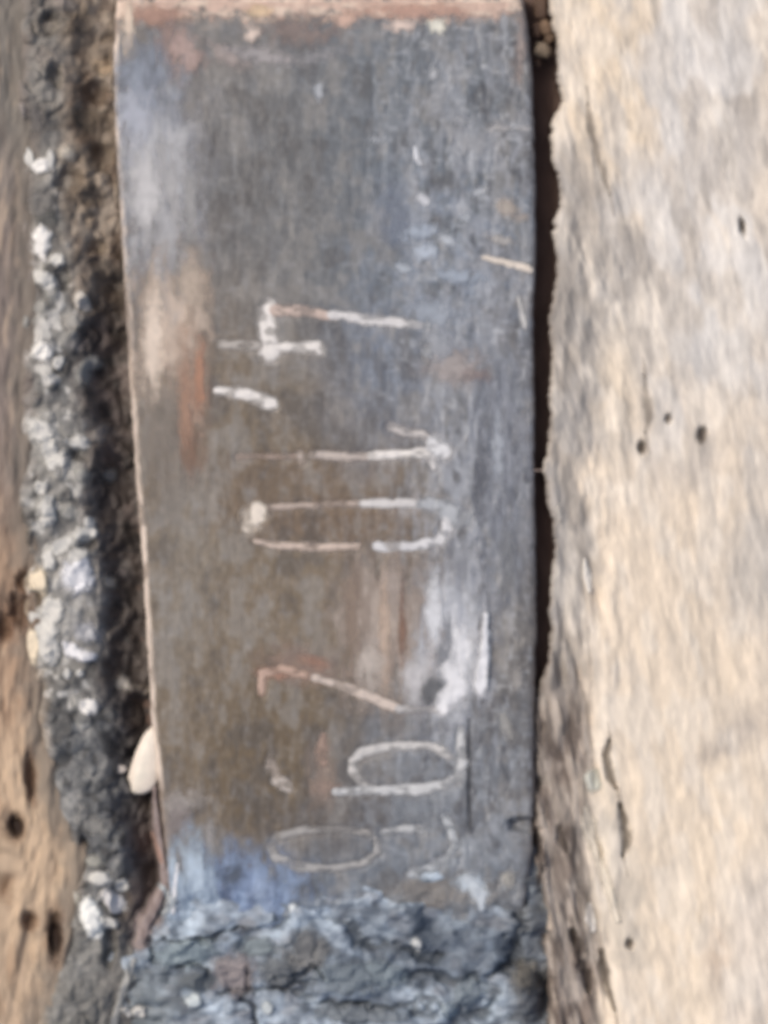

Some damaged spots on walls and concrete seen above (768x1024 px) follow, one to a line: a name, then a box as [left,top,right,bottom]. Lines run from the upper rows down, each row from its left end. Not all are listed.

damp [24,146,74,174]
damp [23,223,65,329]
damp [63,291,92,329]
damp [30,340,65,370]
damp [76,357,103,384]
corrosion [175,345,205,449]
damp [26,417,129,680]
damp [118,676,150,694]
damp [72,696,115,719]